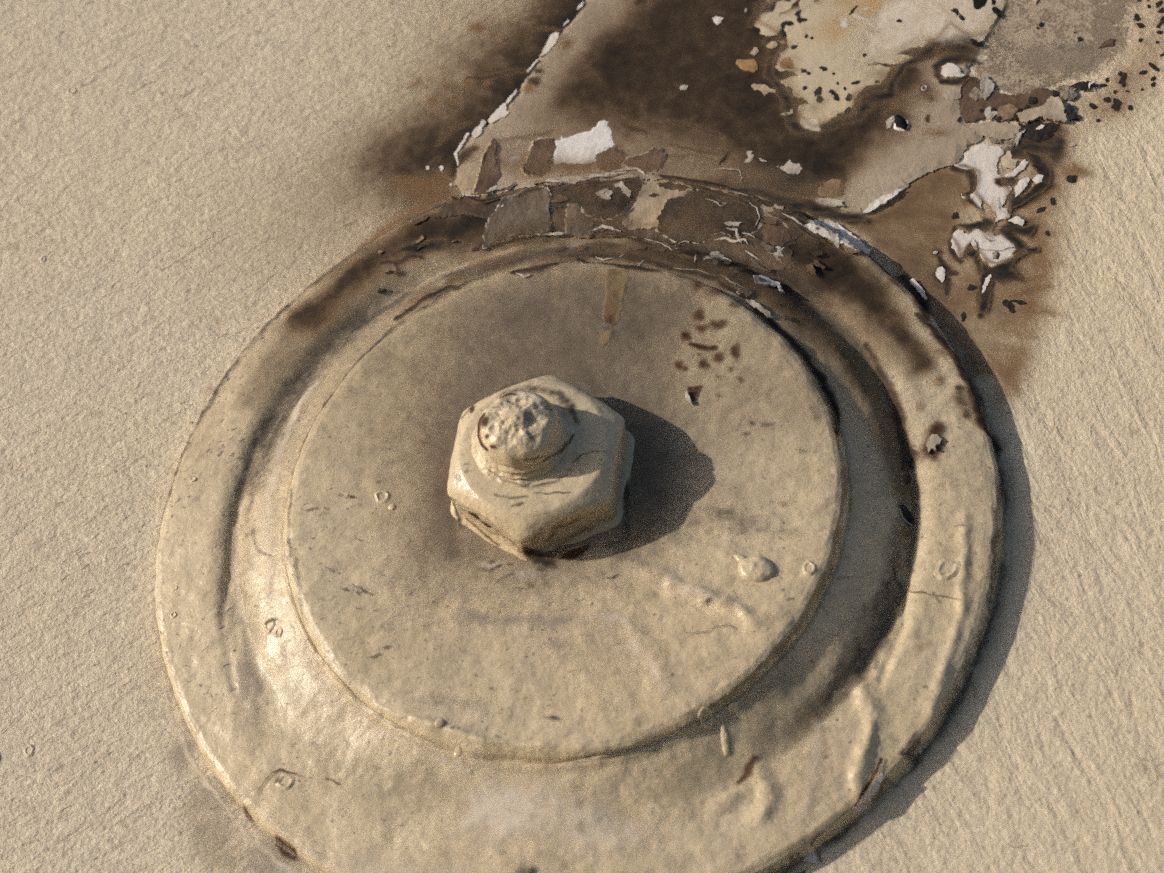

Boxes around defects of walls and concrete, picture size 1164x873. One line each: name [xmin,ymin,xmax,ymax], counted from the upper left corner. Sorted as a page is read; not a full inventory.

peeling [414,0,1137,320]
corrosion [674,308,741,381]